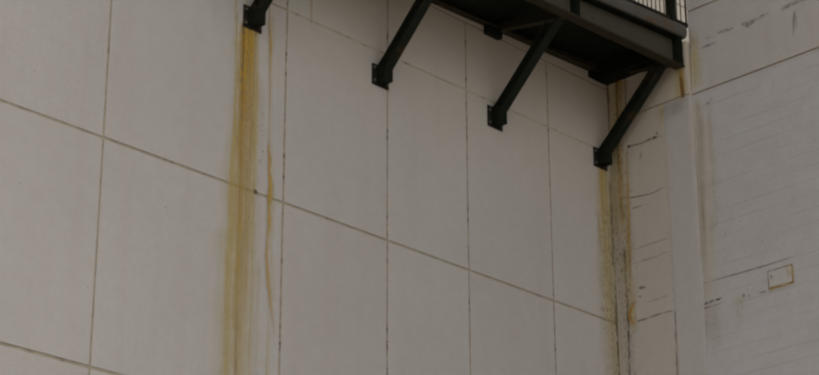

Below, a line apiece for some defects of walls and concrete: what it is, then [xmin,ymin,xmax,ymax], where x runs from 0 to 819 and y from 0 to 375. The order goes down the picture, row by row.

corrosion [234,26,257,161]
corrosion [255,115,272,295]